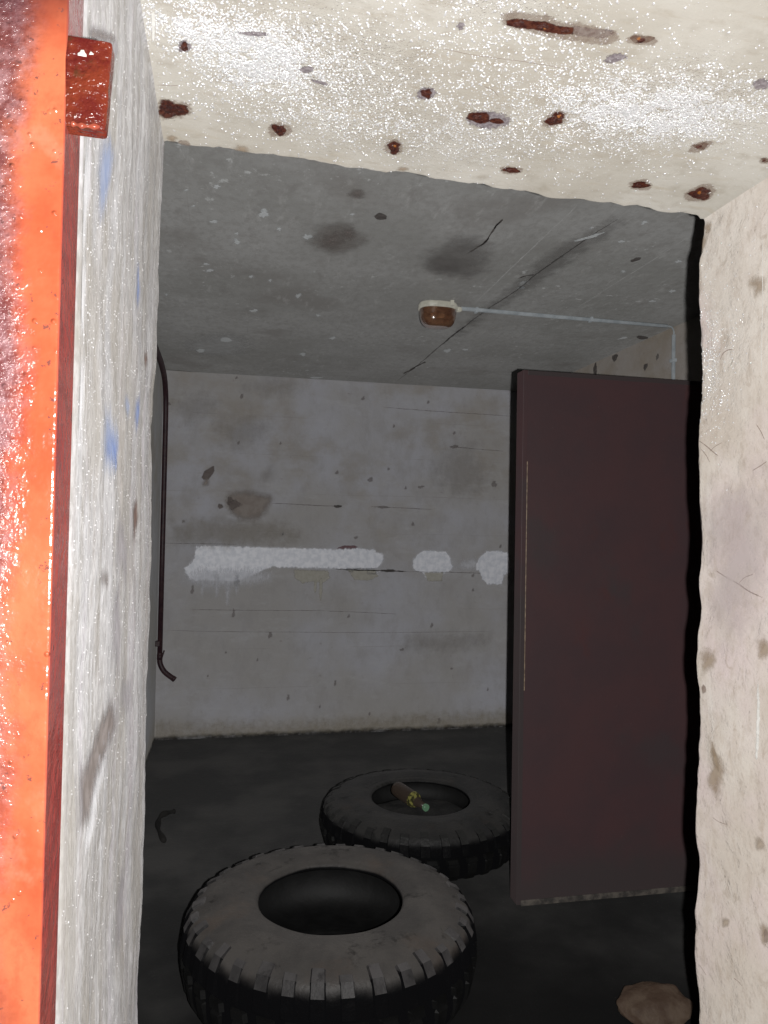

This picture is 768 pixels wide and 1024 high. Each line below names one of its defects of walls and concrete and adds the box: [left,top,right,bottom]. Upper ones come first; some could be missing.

rust [506,19,614,39]
rust [630,35,655,43]
rust [417,87,437,100]
rust [466,111,511,129]
rust [545,112,564,125]
rust [271,124,286,136]
rust [387,141,401,155]
rust [687,187,711,200]
damp [314,226,357,252]
crack [401,219,616,378]
damp [218,492,270,519]